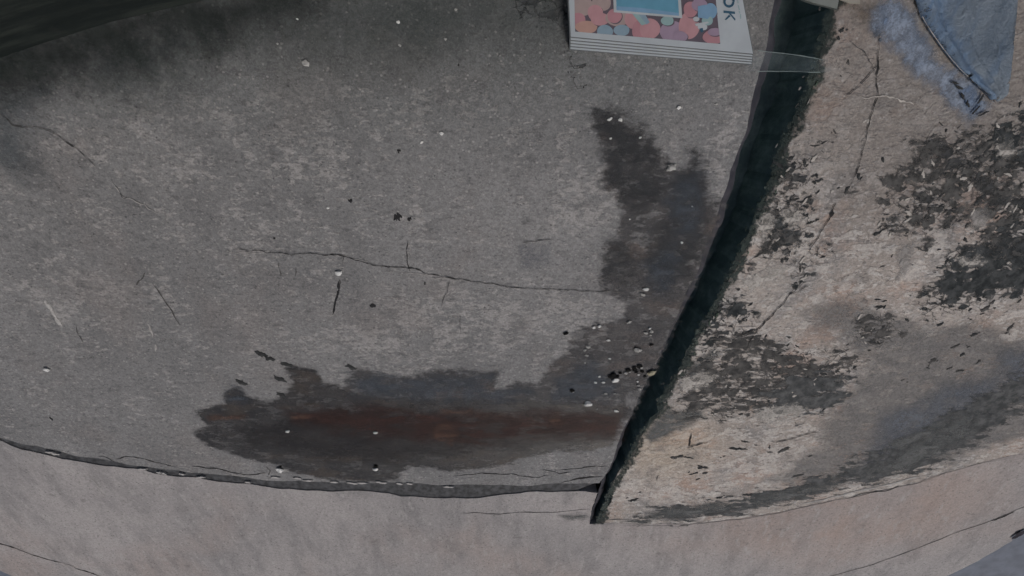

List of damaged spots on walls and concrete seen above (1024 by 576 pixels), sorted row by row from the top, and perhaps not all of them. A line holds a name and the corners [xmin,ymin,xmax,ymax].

peeling [950,81,989,116]
peeling [756,129,836,238]
peeling [874,203,918,280]
peeling [966,196,1003,227]
crack [223,242,640,303]
water stain [196,109,727,482]
crack [734,286,808,346]
peeling [678,372,718,391]
spalling [928,332,980,372]
peeling [754,405,805,424]
spalling [720,440,790,458]
crack [0,438,1008,526]